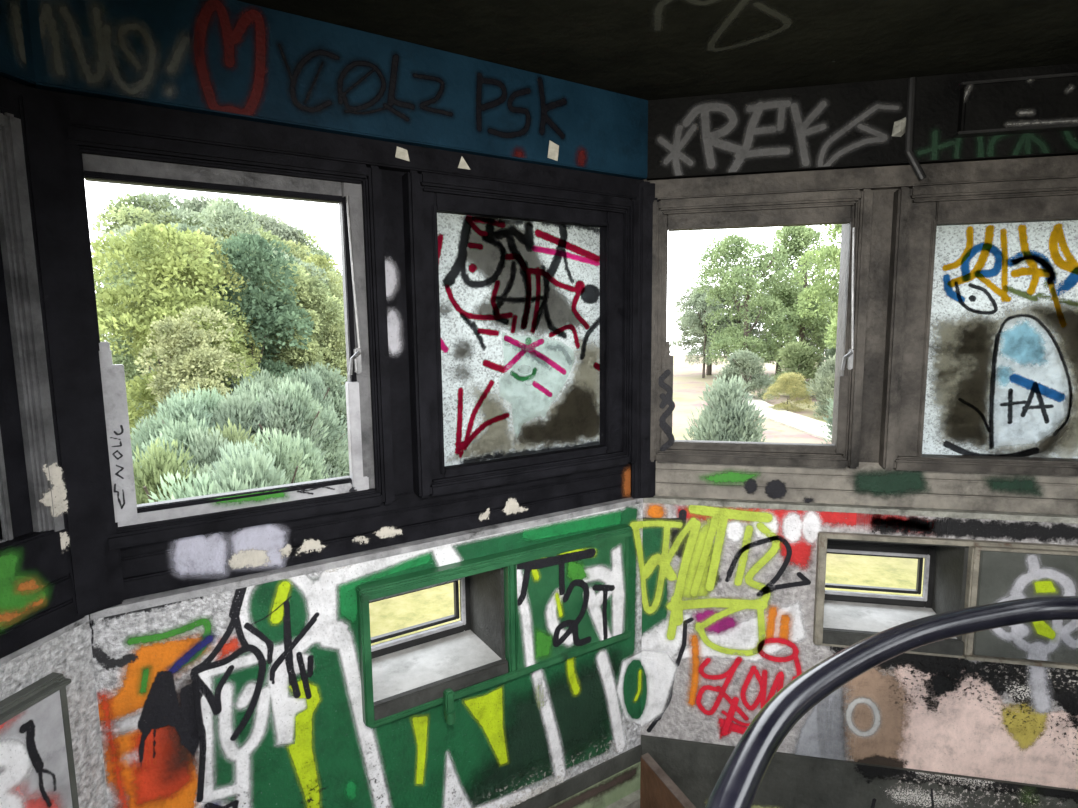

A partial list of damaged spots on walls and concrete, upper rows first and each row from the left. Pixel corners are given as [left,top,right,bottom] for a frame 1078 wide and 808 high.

peeling [39,463,68,517]
peeling [60,532,70,550]
peeling [352,527,402,545]